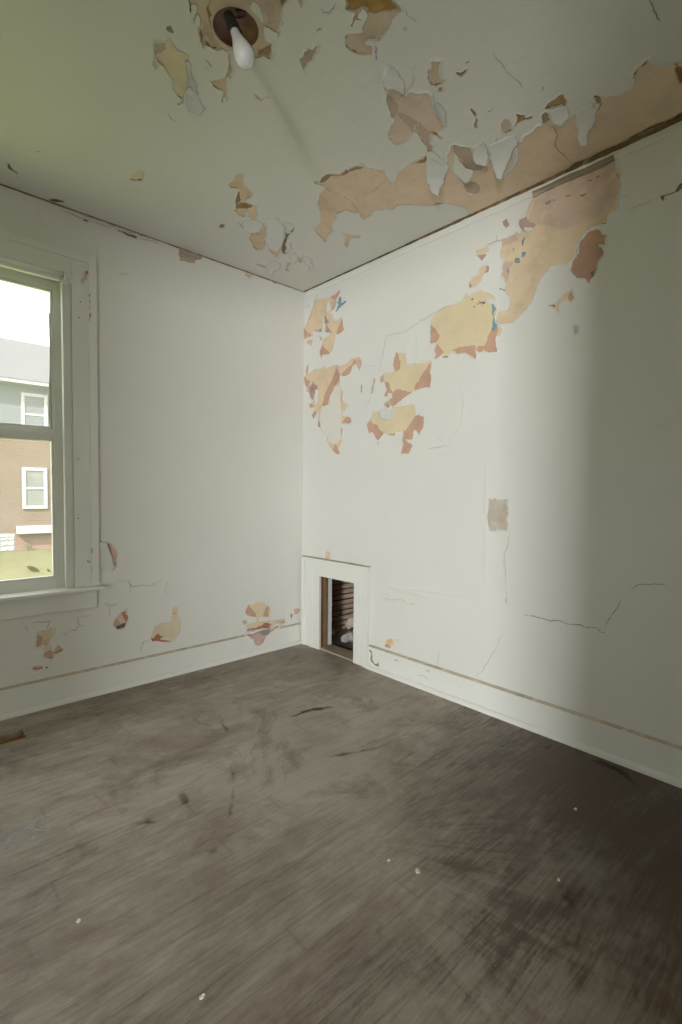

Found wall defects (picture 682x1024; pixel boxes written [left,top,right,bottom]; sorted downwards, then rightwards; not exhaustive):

peeling [151,0,305,115]
peeling [218,171,314,275]
peeling [304,0,682,456]
peeling [32,626,64,671]
peeling [112,607,131,631]
peeling [148,604,181,644]
peeling [241,600,301,647]
crack [519,584,667,633]